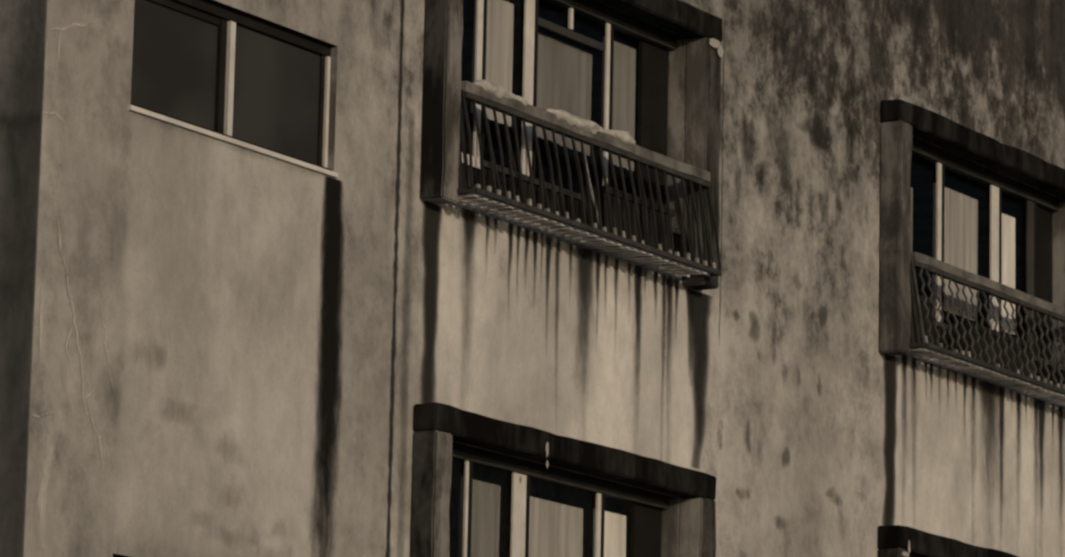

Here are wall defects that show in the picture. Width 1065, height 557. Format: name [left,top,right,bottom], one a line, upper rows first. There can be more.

damp [315,176,343,557]
damp [463,208,710,468]
damp [884,354,1064,525]